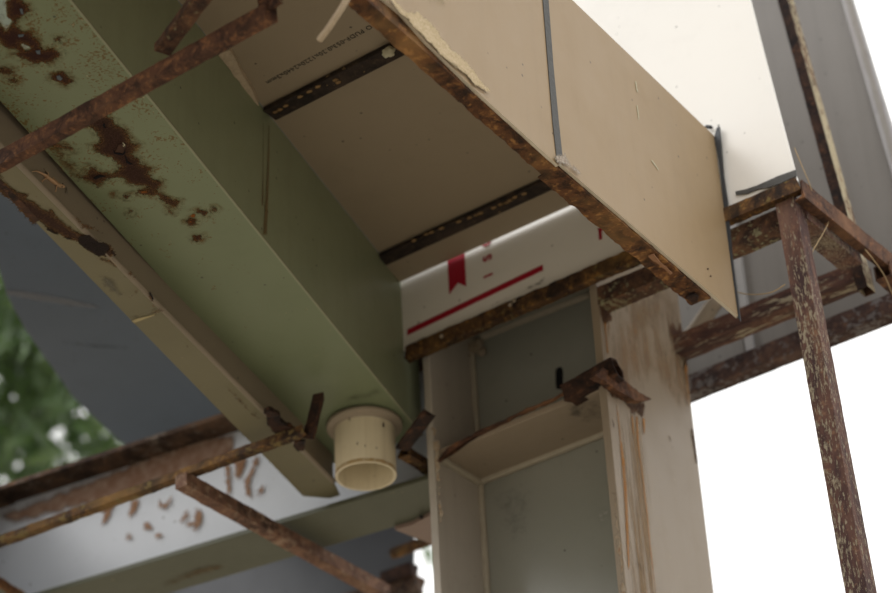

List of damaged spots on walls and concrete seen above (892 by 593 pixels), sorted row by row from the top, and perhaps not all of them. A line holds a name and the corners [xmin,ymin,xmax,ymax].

rust [0,0,283,267]
peeling [391,0,490,92]
rust [0,435,390,593]
rust [611,393,656,593]